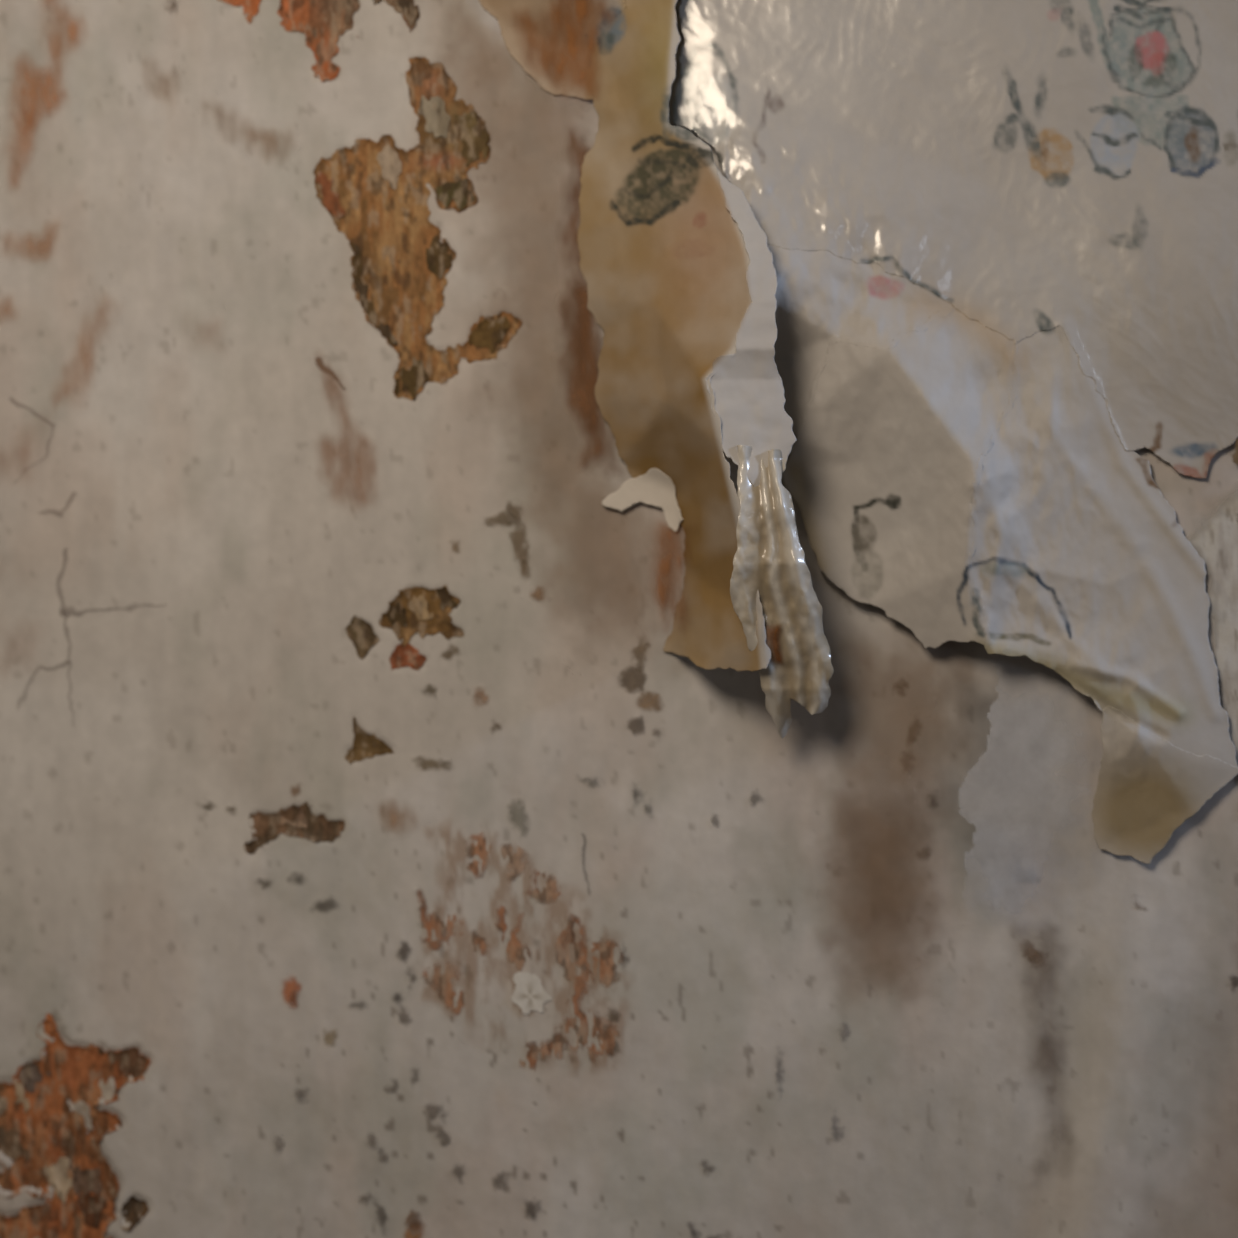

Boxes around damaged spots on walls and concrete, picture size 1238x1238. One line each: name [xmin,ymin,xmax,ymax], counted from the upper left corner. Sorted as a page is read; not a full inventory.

spalling [221,0,261,24]
spalling [277,0,420,82]
spalling [313,57,522,400]
spalling [488,504,528,574]
spalling [345,585,464,670]
spalling [622,644,660,734]
spalling [421,760,446,769]
spalling [244,789,345,854]
spalling [317,900,334,910]
spalling [0,1013,151,1238]